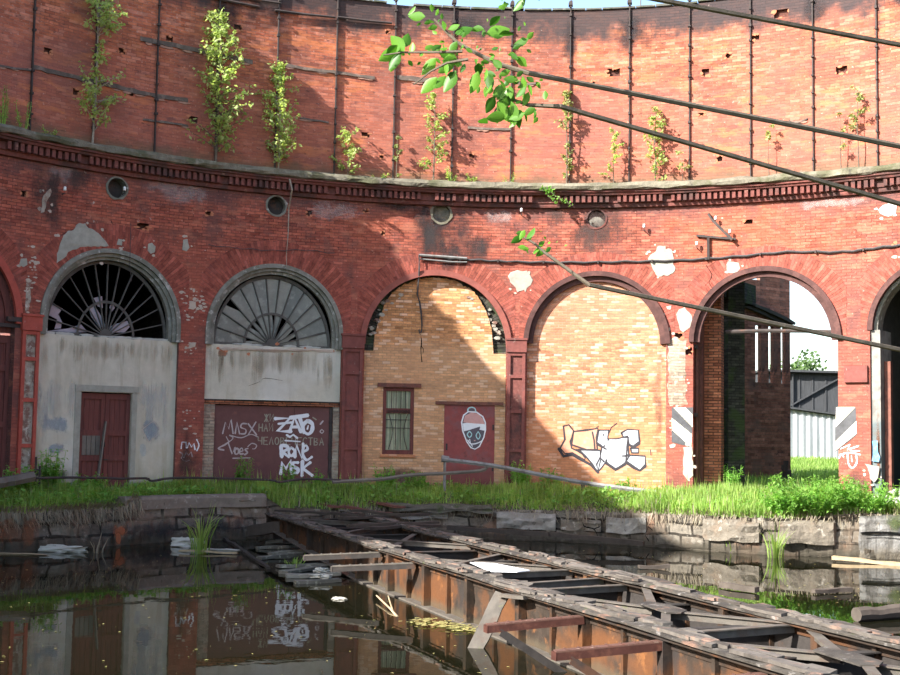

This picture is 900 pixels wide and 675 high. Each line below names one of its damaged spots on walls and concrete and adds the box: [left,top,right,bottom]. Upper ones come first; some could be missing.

flaking render [54,222,125,263]
water stain [417,208,488,266]
flaking render [645,244,676,278]
flaking render [508,270,533,294]
peeling [179,288,207,321]
spalling [664,306,693,407]
flaking render [669,443,697,481]